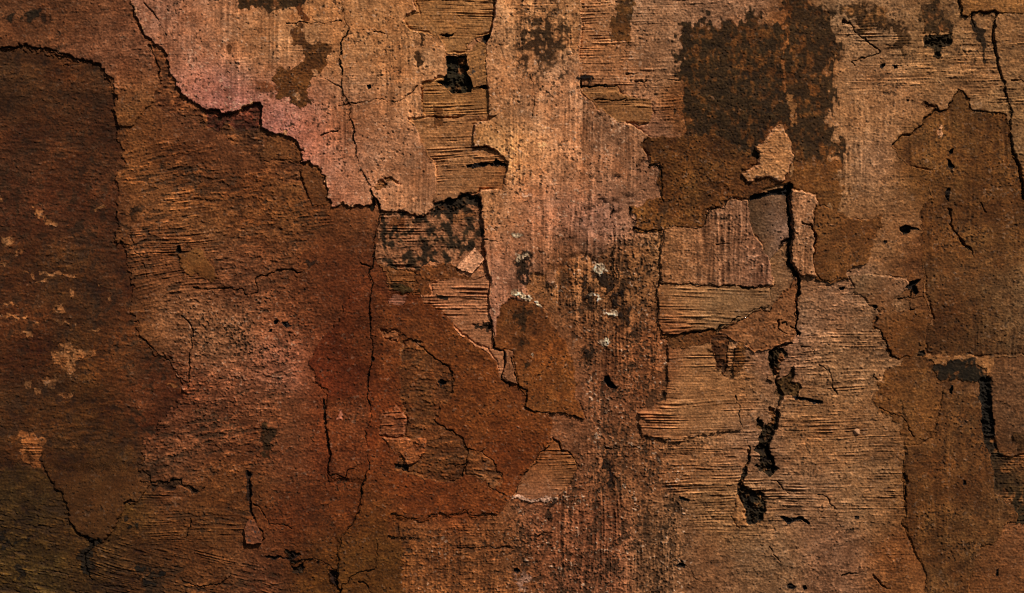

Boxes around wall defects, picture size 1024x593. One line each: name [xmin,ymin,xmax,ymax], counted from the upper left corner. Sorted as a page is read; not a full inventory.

damp [671,0,912,211]
crack [892,0,1024,202]
spalling [0,0,802,593]
crack [612,183,840,493]
spalling [902,377,1024,593]